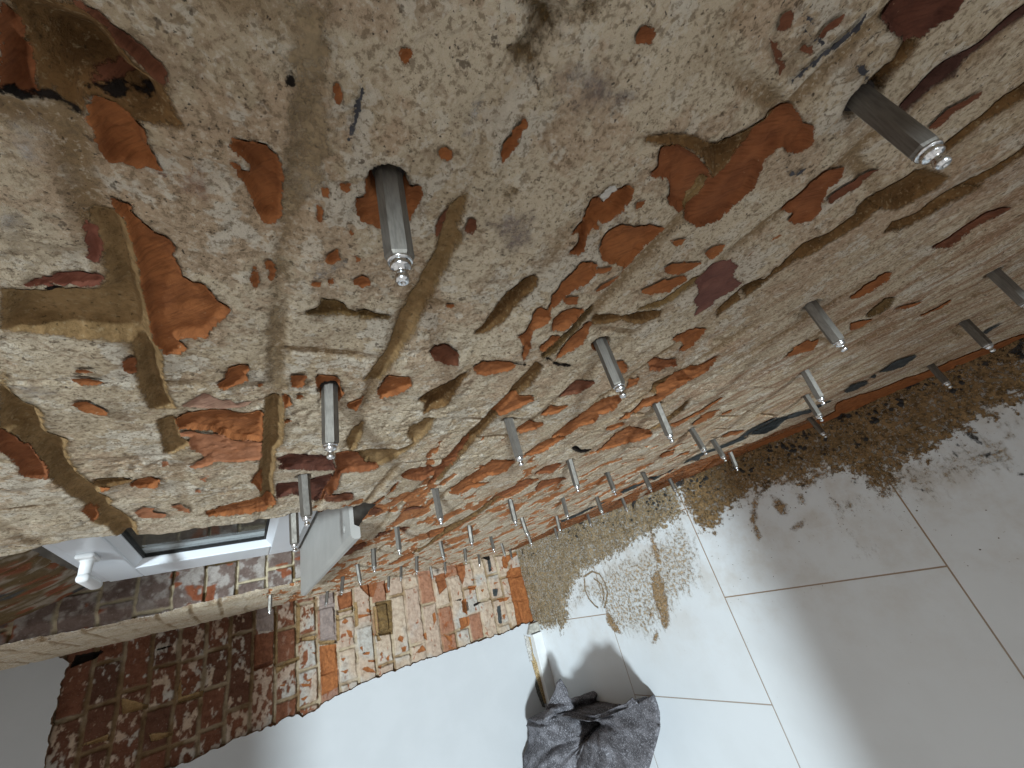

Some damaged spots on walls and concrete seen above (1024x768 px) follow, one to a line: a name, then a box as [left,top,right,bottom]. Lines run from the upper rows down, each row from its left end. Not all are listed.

spalling [0,0,184,171]
spalling [229,138,285,224]
spalling [644,102,815,228]
spalling [111,198,231,356]
spalling [473,185,686,376]
spalling [377,375,412,399]
spalling [430,343,459,366]
spalling [174,409,379,517]
spalling [368,433,469,515]
spalling [435,328,1024,662]
spalling [301,644,349,701]
spalling [337,582,437,673]